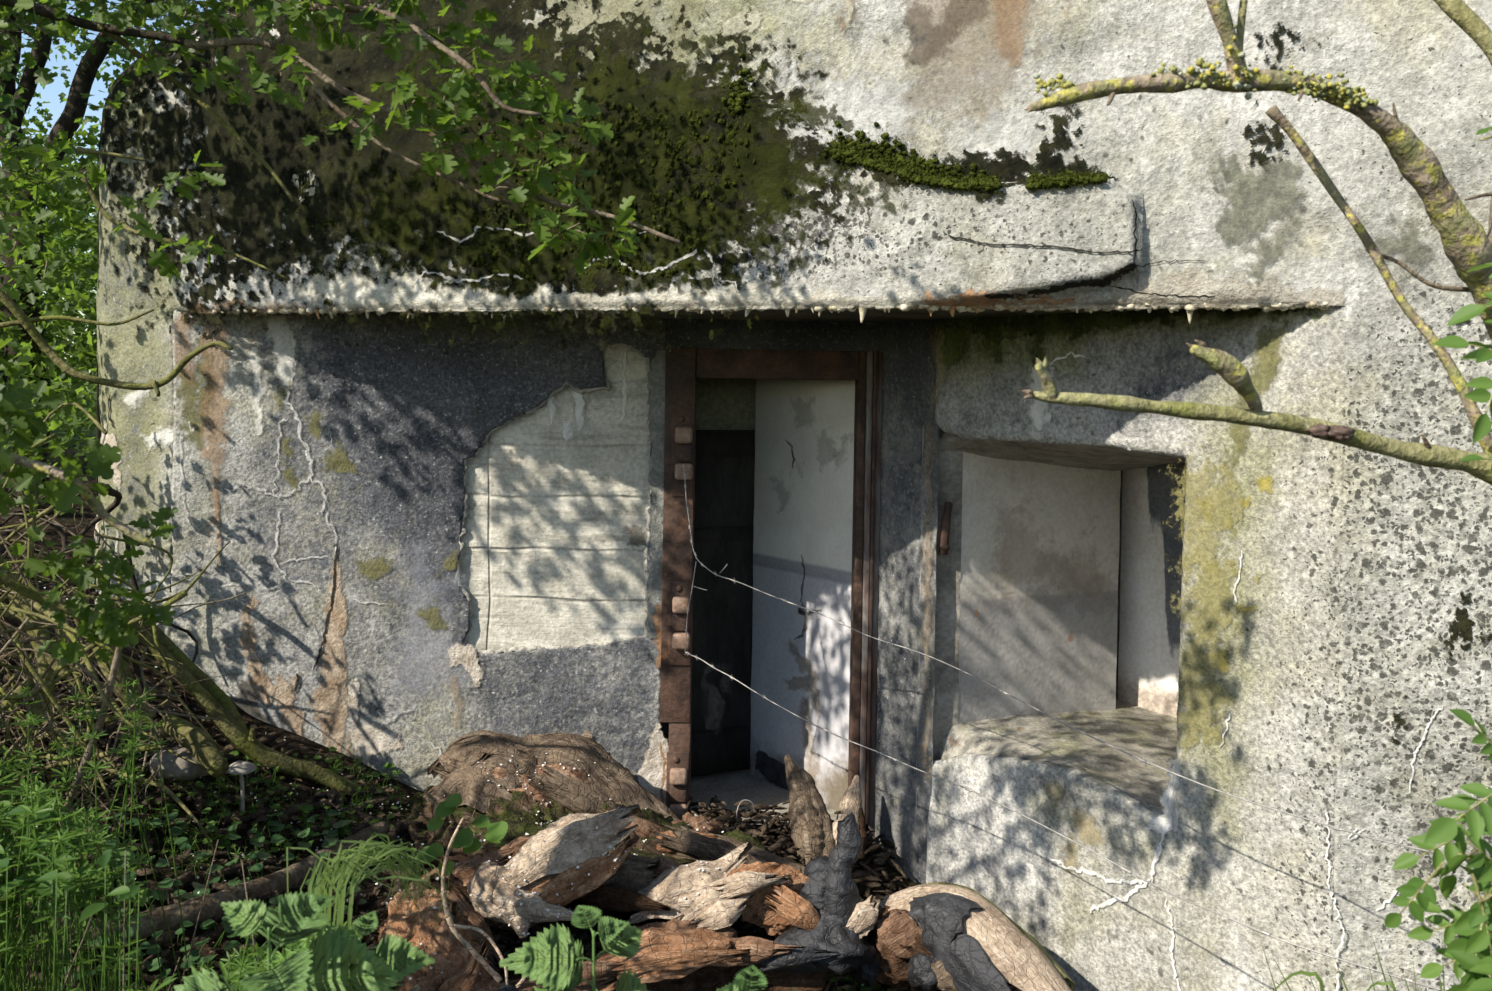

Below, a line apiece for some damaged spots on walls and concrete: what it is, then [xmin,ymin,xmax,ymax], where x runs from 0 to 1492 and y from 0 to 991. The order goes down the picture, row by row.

rust [924,289,1087,310]
crack [946,200,1214,301]
crack [153,381,386,692]
peeling [447,344,666,687]
crack [794,554,821,640]
peeling [274,673,304,736]
peeling [345,677,403,766]
crack [1048,761,1181,991]